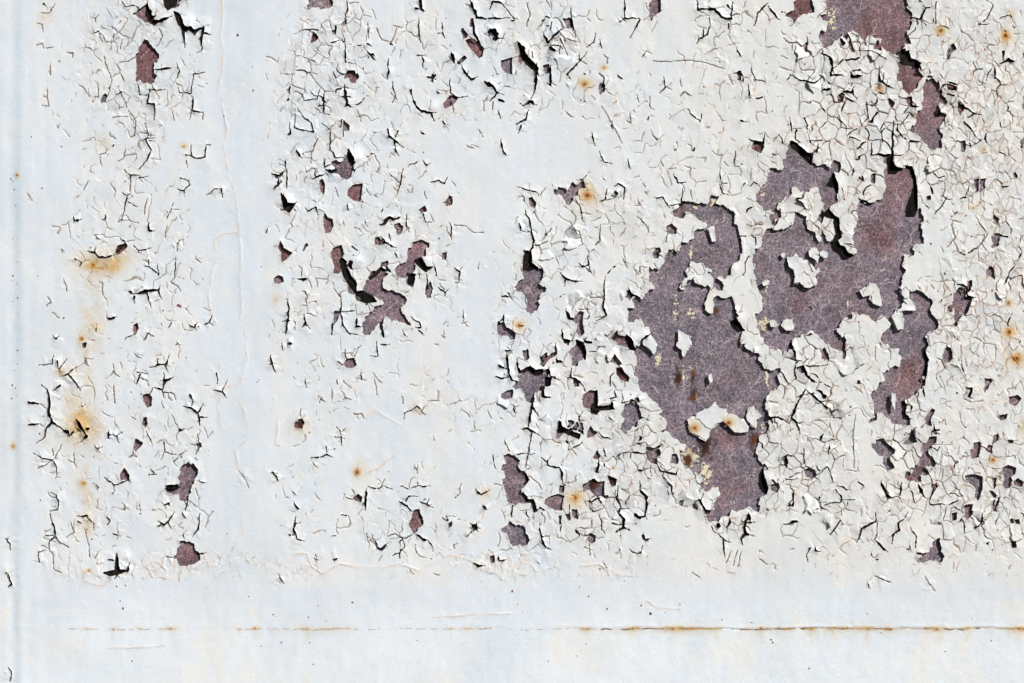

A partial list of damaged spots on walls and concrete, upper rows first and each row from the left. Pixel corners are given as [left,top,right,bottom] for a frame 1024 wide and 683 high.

peeling [80,0,202,168]
crack [994,50,1016,79]
peeling [274,0,447,339]
crack [28,0,227,580]
crack [270,0,988,591]
peeling [426,0,1024,572]
peeling [164,429,202,511]
rust [570,467,616,504]
rust [683,424,717,466]
peeling [169,526,200,566]
rust [557,619,722,631]
rust [732,622,906,643]